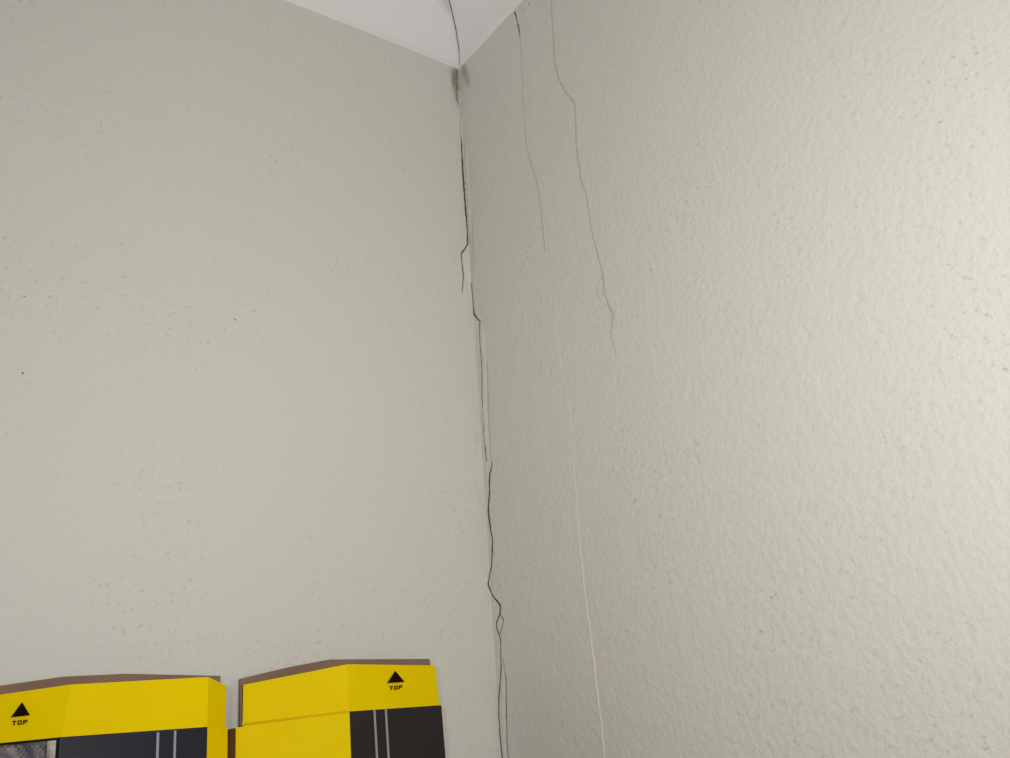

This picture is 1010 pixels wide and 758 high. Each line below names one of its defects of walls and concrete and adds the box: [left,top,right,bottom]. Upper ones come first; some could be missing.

crack [514,12,545,252]
crack [551,7,616,355]
crack [457,99,508,758]